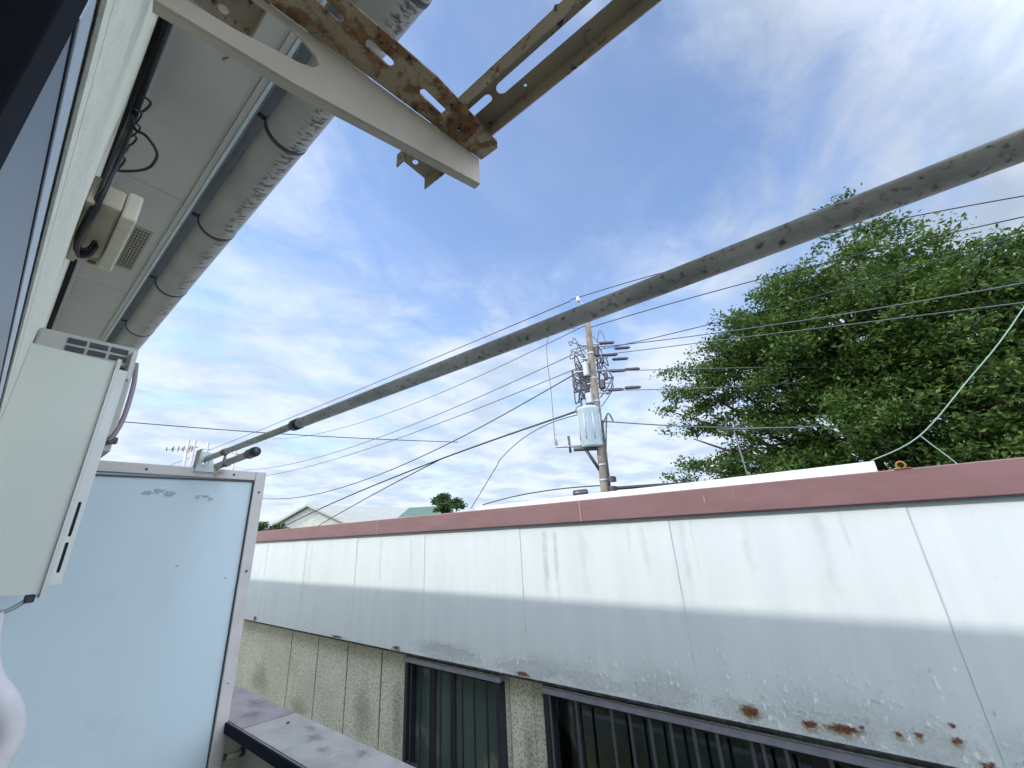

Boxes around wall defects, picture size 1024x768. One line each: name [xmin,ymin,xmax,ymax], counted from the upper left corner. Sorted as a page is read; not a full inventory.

rust [742,706,758,720]
rust [803,720,865,739]